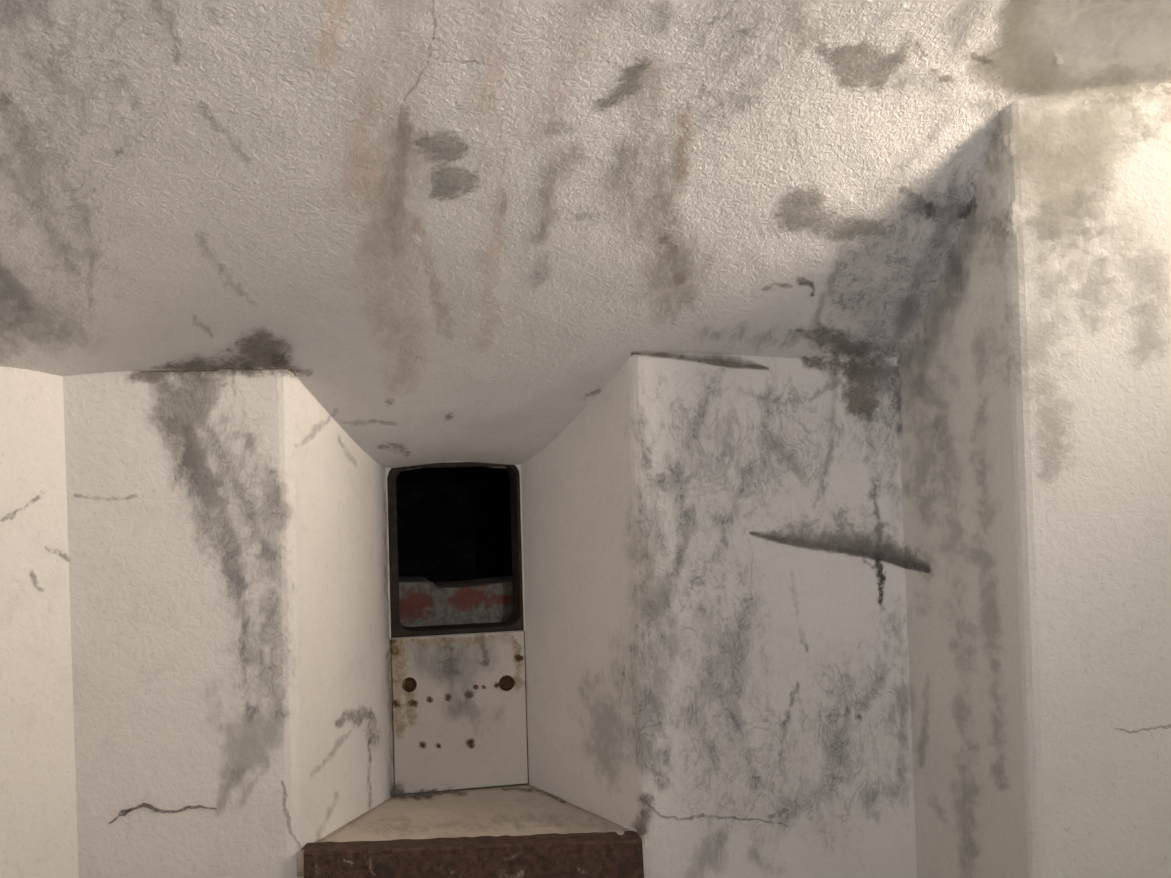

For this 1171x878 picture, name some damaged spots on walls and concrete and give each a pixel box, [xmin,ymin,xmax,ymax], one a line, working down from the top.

leakage [977,0,1171,95]
leakage [833,176,976,448]
rust [393,678,516,708]
crack [109,803,217,824]